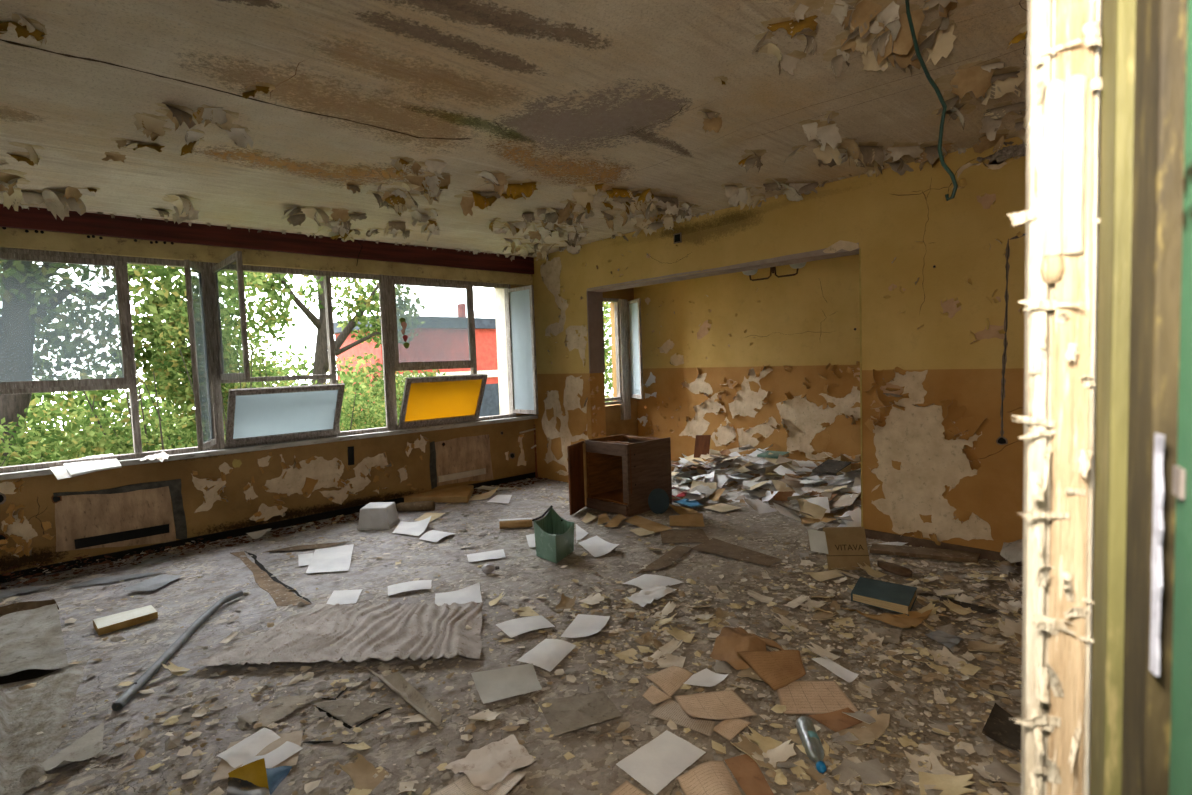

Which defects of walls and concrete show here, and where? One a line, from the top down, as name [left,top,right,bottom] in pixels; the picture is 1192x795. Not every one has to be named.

peeling [0,13,47,44]
water stain [219,0,281,9]
water stain [355,0,610,74]
peeling [102,103,253,163]
water stain [494,78,692,157]
peeling [136,194,211,226]
corrosion [1182,164,1192,231]
peeling [637,295,993,545]
peeling [721,0,1102,795]
peeling [0,478,54,558]
peeling [192,459,242,513]
peeling [243,434,445,522]